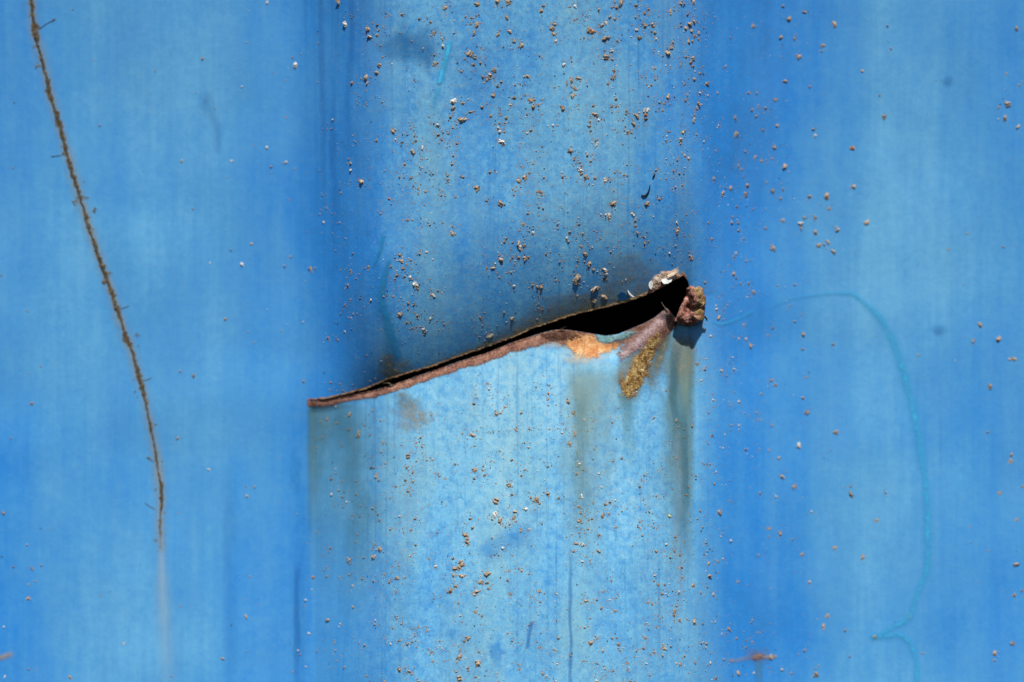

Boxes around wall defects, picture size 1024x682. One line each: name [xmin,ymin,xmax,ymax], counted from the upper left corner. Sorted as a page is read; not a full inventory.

corrosion [307,308,693,464]